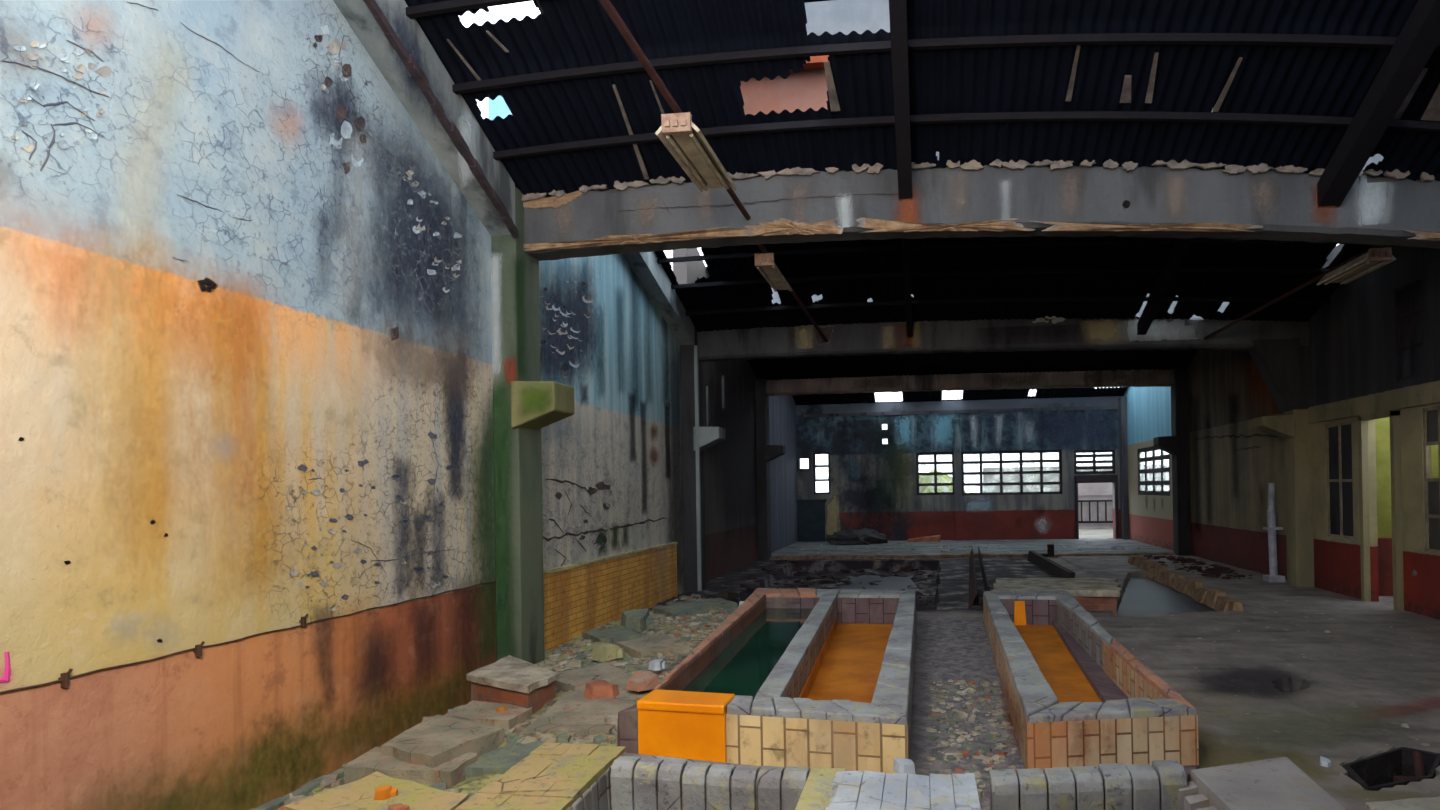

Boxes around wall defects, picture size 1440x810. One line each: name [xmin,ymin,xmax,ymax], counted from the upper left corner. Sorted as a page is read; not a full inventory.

crack [2,40,109,171]
crack [128,2,259,72]
peeling [313,25,352,91]
damp [314,82,367,156]
peeling [329,104,366,174]
damp [387,14,470,176]
crack [178,195,252,221]
peeling [398,170,462,239]
damp [372,144,474,498]
crack [351,431,455,573]
damp [396,463,443,592]
spalling [1342,747,1440,791]